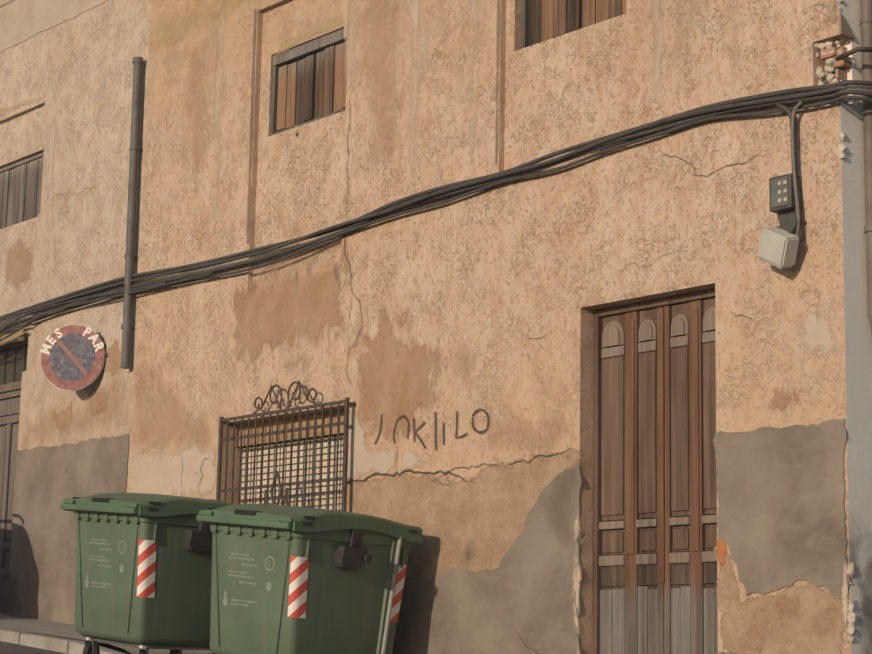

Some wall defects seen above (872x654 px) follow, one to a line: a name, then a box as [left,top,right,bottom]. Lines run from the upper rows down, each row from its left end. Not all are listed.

crack [662,145,773,176]
peeling [234,257,344,362]
crack [334,239,368,382]
peeling [130,443,217,497]
crack [348,444,570,485]
spalling [346,310,580,584]
spalling [573,516,581,636]
spalling [842,562,856,644]